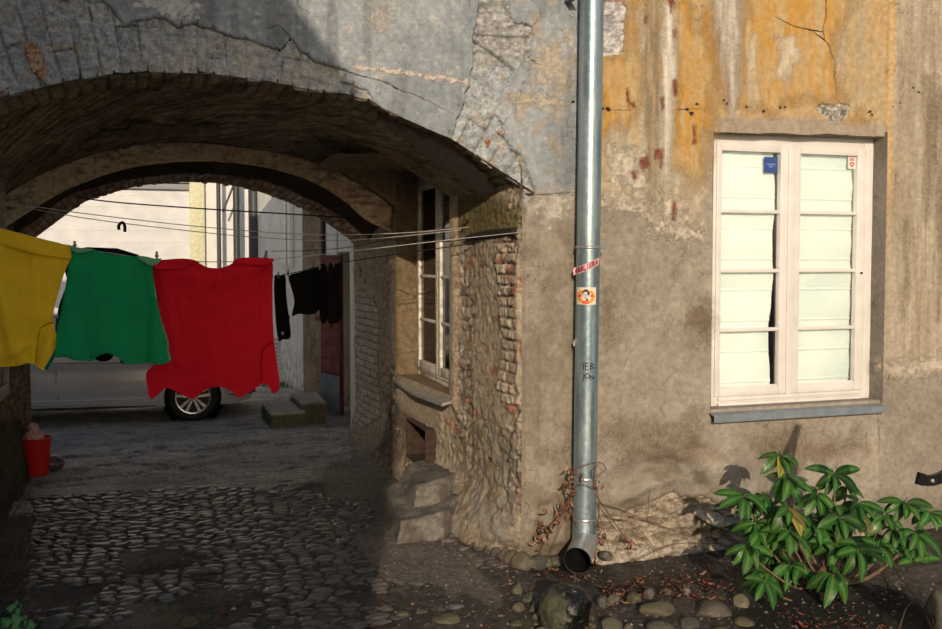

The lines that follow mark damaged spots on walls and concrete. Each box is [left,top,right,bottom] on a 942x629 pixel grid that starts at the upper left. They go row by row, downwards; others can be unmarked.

spalling [0,0,577,231]
peeling [601,0,708,249]
peeling [668,0,873,184]
crack [777,0,837,89]
spalling [492,236,519,415]
spalling [592,491,767,565]